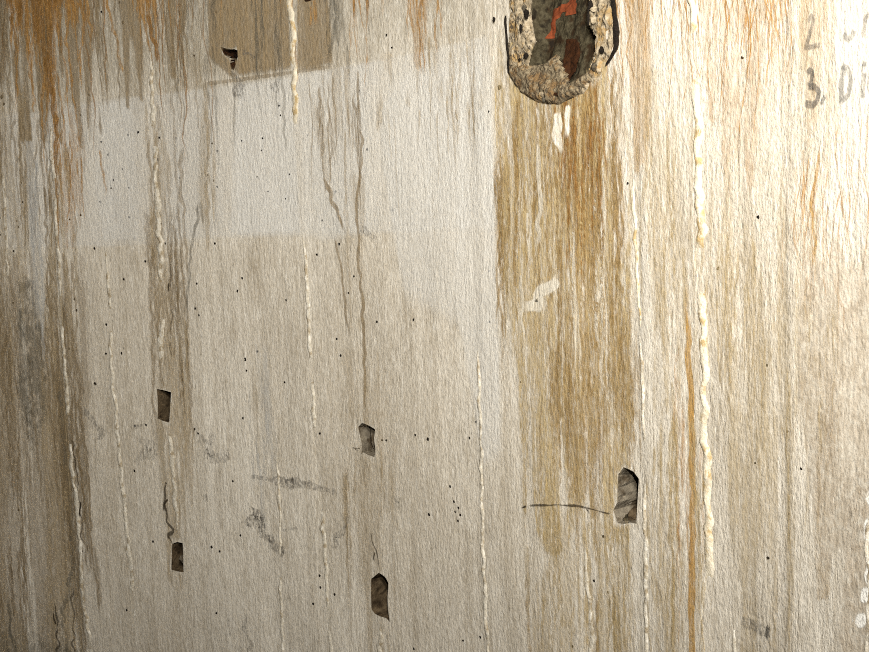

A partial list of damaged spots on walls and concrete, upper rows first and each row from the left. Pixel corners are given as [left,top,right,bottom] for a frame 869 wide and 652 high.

corrosion [132,0,158,60]
spalling [508,0,536,75]
corrosion [562,38,581,81]
spalling [577,0,613,97]
corrosion [715,0,772,69]
corrosion [8,0,91,228]
corrosion [498,121,519,277]
corrosion [553,85,604,352]
corrosion [803,160,814,231]